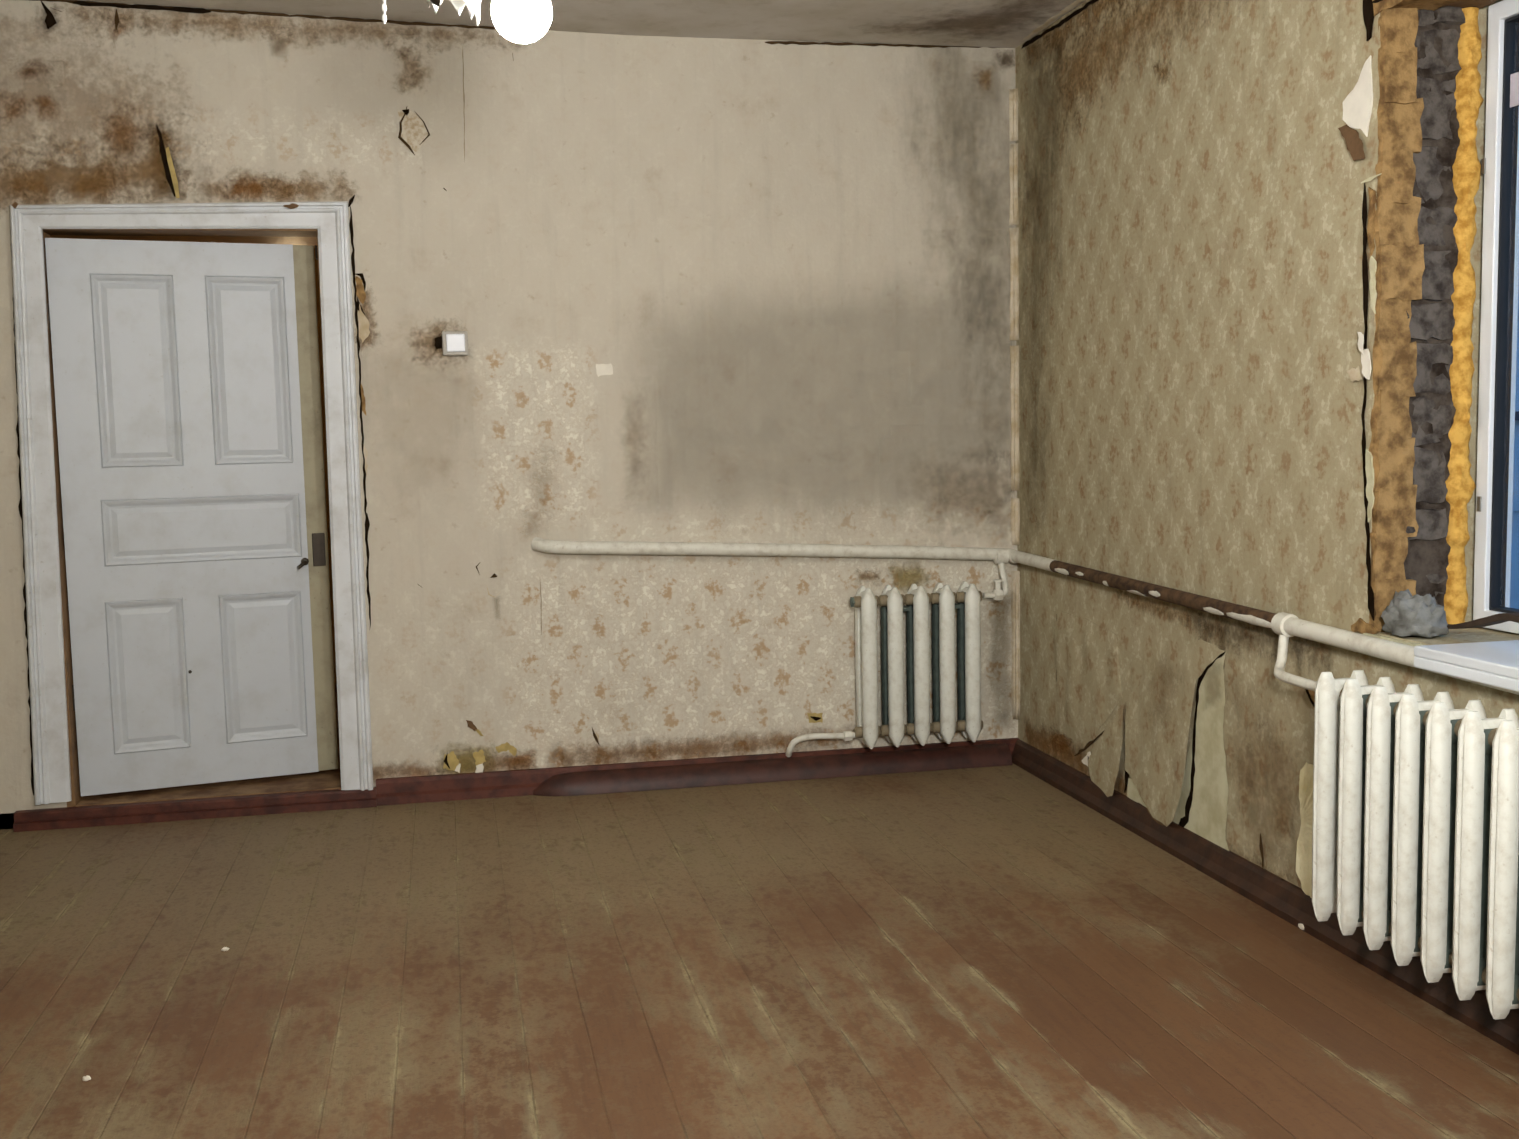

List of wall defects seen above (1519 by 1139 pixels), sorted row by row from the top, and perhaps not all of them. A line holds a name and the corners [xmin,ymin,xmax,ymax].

damp [78,12,273,36]
damp [1057,0,1196,113]
damp [0,118,174,205]
damp [208,178,346,200]
flaking render [1338,0,1497,647]
peeling [443,720,517,773]
damp [475,754,533,772]
damp [554,737,824,765]
peeling [1074,639,1229,851]